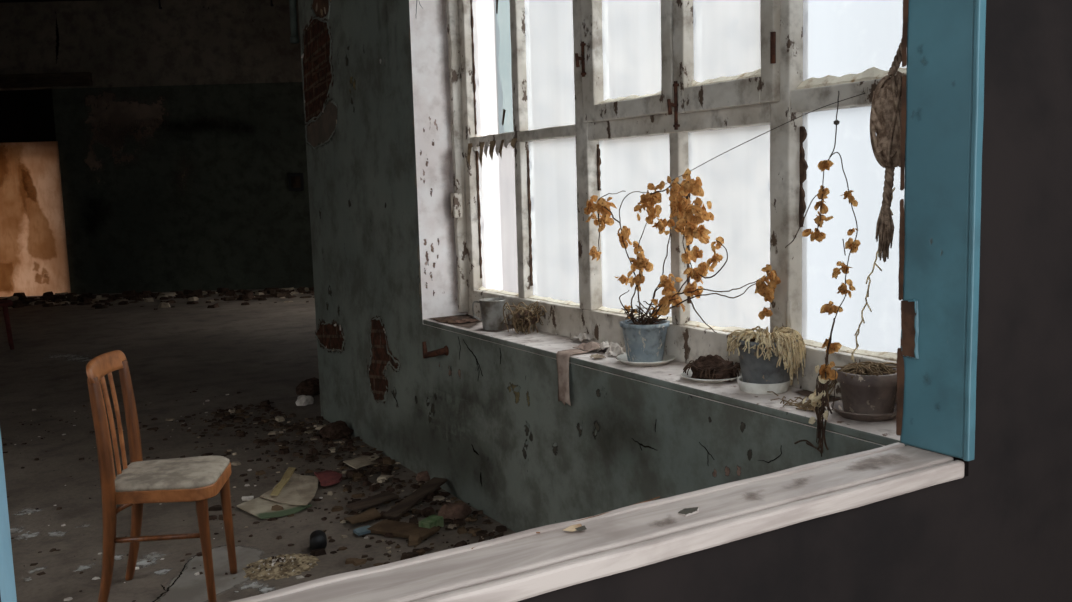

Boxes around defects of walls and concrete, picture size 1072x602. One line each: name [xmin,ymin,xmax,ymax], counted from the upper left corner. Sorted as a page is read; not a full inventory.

spalling [301,0,338,150]
spalling [315,286,346,354]
spalling [367,315,401,407]